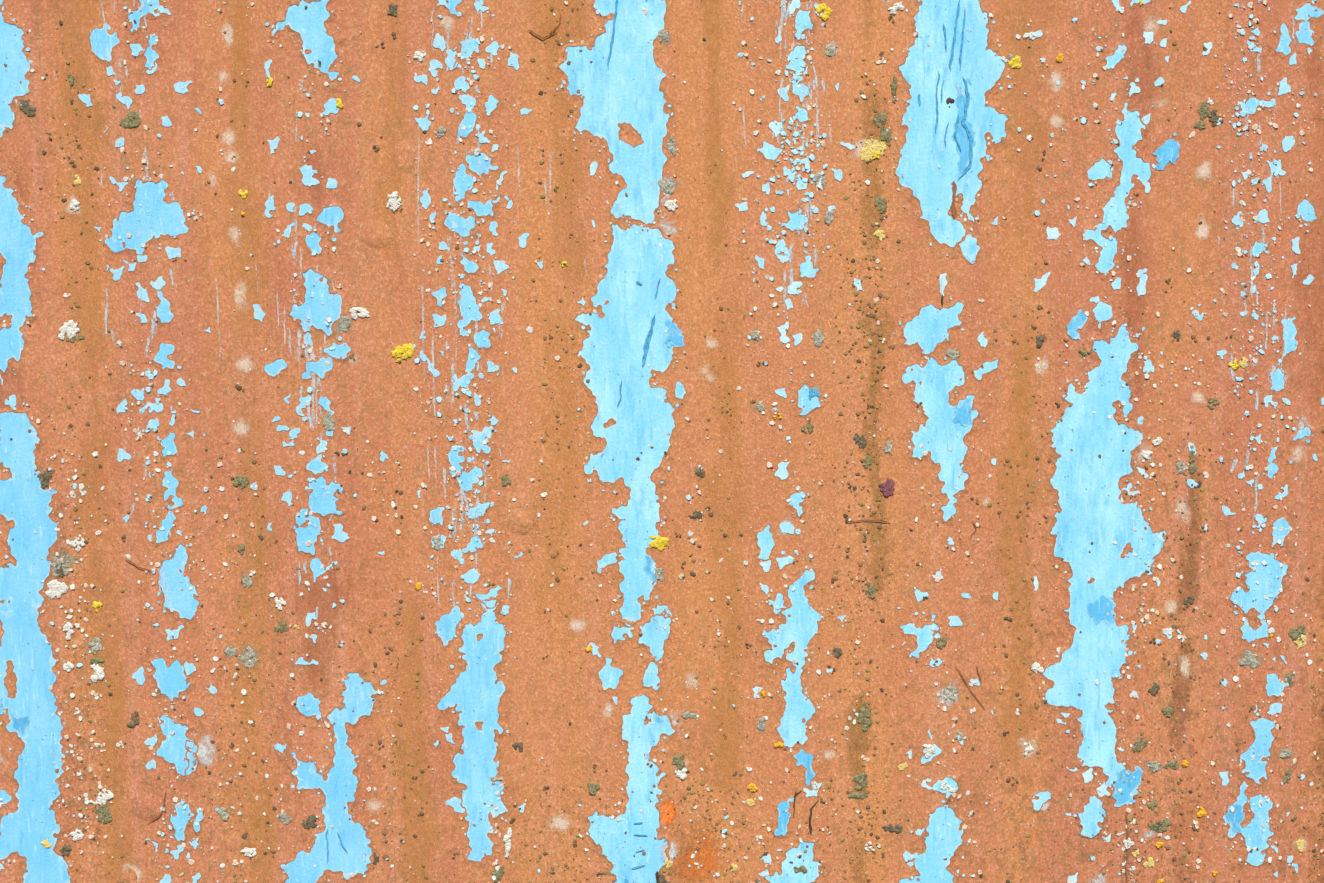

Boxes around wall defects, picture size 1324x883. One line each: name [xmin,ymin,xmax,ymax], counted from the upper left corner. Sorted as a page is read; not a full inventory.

peeling [0,0,77,883]
peeling [94,166,217,784]
peeling [262,136,354,592]
peeling [274,665,387,883]
peeling [413,0,519,406]
peeling [417,415,526,868]
peeling [553,0,693,883]
rust [661,800,676,825]
peeling [751,462,846,883]
peeling [888,0,1016,265]
peeling [897,273,1007,545]
peeling [1029,0,1180,842]